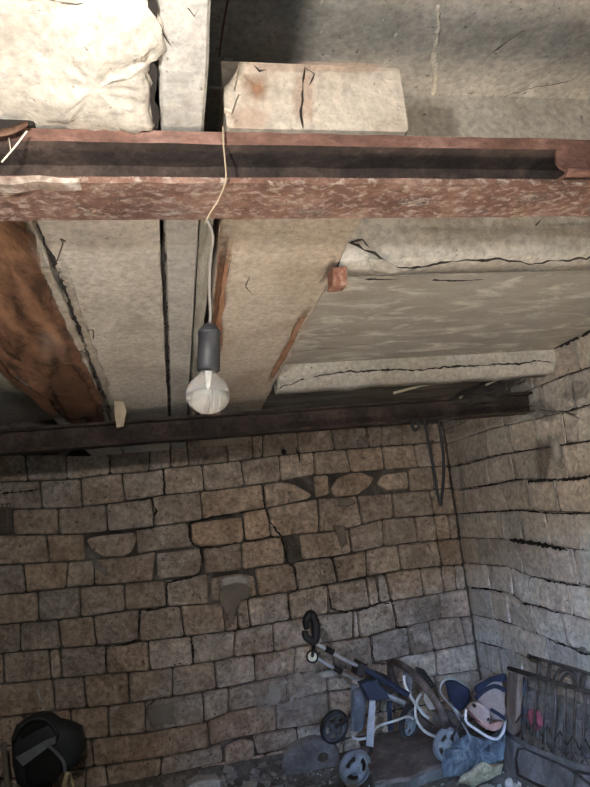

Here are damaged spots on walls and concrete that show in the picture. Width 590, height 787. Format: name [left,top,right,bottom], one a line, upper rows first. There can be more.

crack [148,0,171,46]
crack [150,63,160,130]
crack [299,67,315,127]
rust [0,120,29,137]
crack [348,239,590,282]
crack [37,224,111,412]
rust [212,251,230,351]
crack [279,330,590,389]
crack [457,475,590,491]
crack [461,508,590,516]
spalling [219,575,250,624]